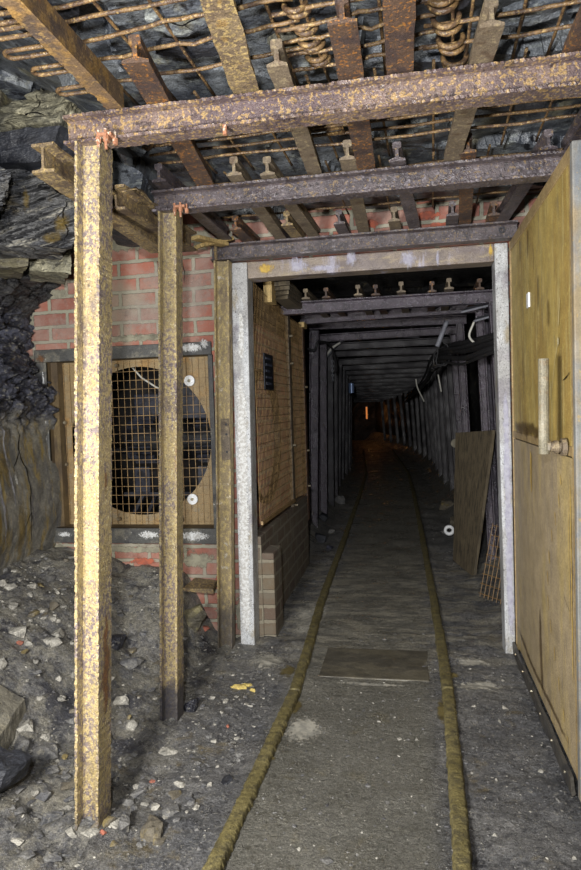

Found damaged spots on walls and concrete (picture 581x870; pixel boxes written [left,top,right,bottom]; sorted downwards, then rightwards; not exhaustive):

corrosion [101,617,109,712]